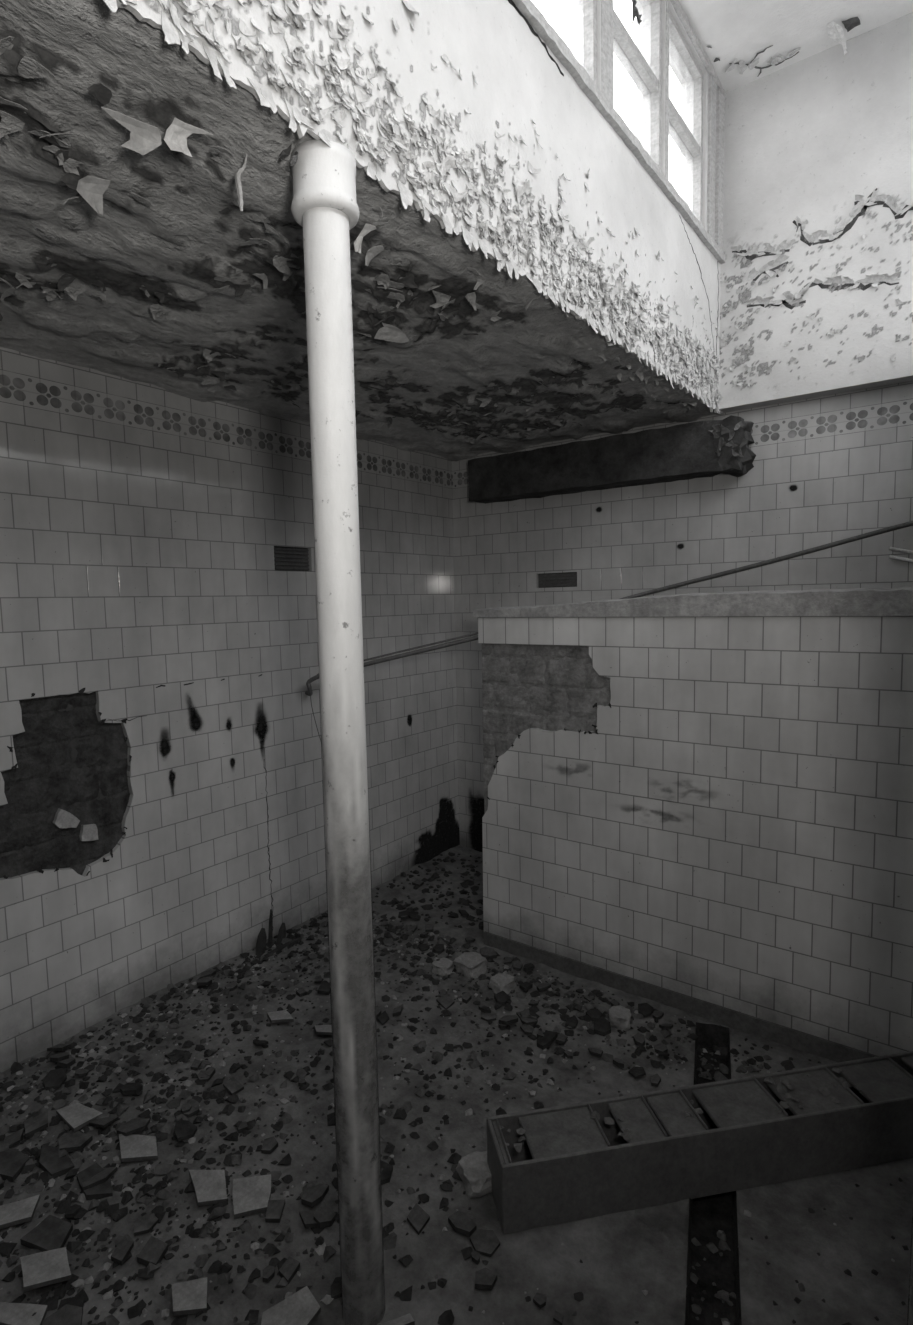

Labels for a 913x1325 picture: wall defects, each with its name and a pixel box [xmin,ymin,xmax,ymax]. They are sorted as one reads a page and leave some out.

flaking render [0,26,154,216]
flaking render [0,75,308,408]
peeling [103,0,913,457]
peeling [0,687,132,879]
water stain [188,699,201,730]
water stain [255,708,268,752]
peeling [481,644,611,813]